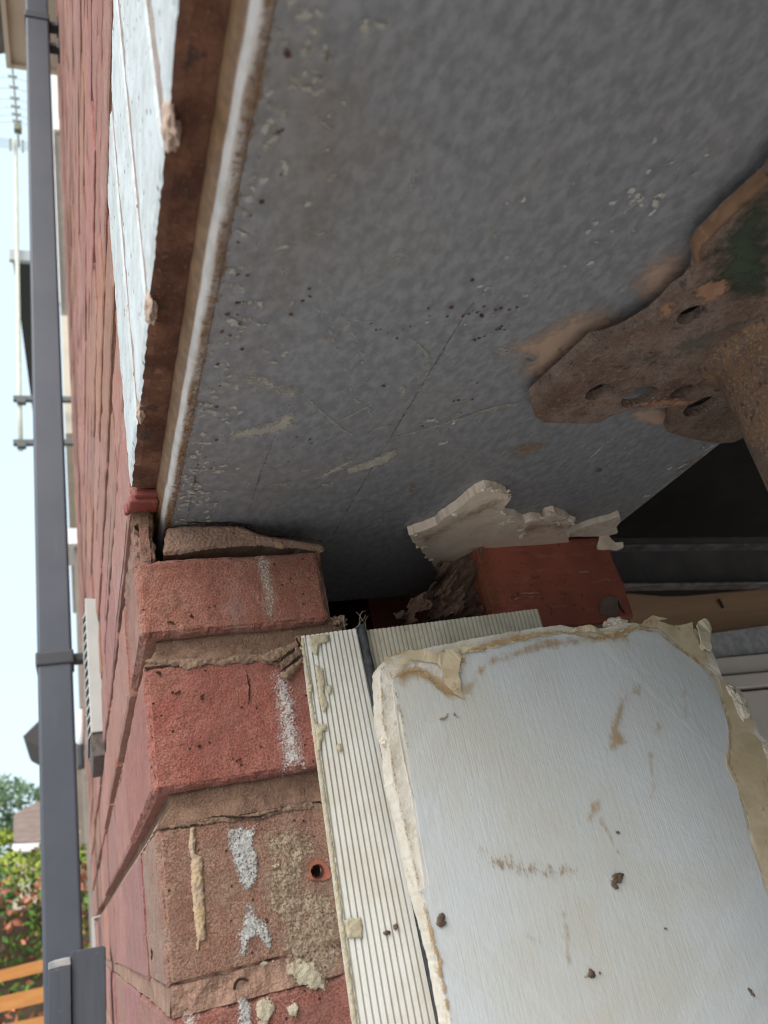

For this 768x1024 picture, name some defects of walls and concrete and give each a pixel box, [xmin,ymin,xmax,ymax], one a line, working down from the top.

rust [693,279,728,302]
rust [515,312,628,377]
rust [627,398,700,425]
peeling [162,521,324,561]
spalling [260,634,303,680]
damp [275,675,304,770]
crack [189,810,278,826]